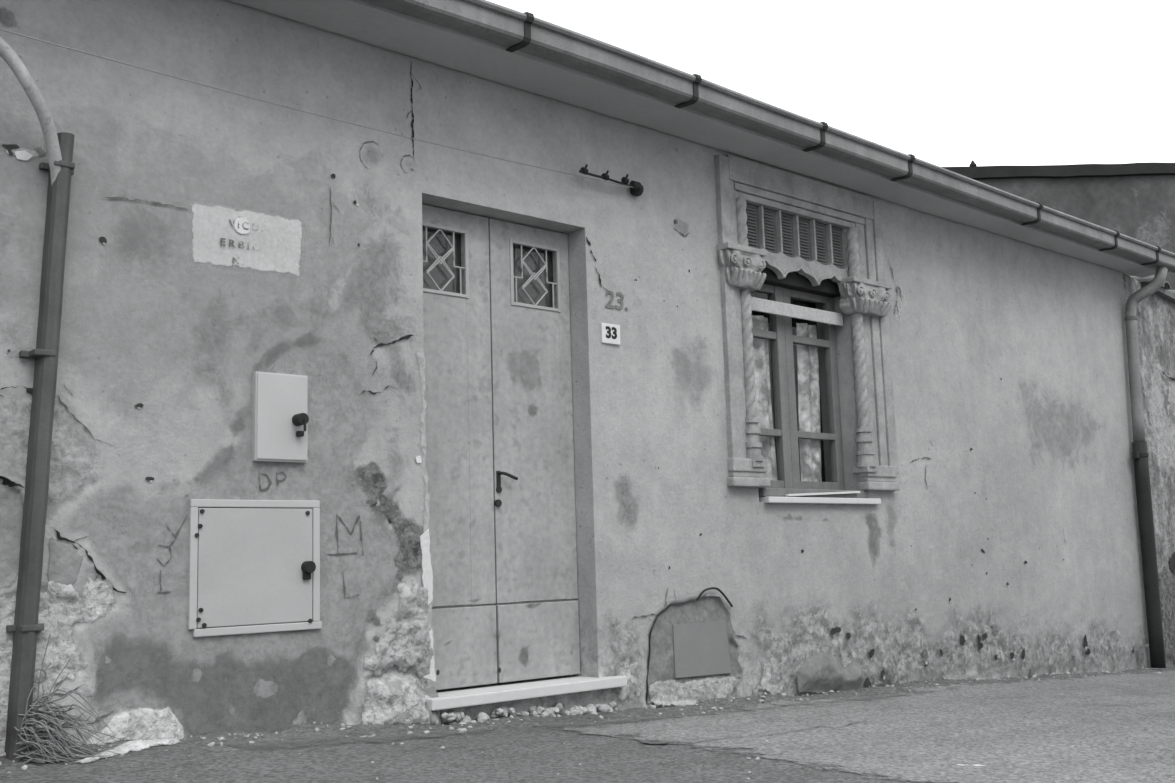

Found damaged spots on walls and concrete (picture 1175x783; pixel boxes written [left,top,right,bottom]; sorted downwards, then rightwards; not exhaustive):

crack [406,61,422,156]
crack [359,334,414,396]
crack [0,476,24,488]
flaking render [0,388,33,477]
flaking render [47,405,98,515]
crack [58,384,114,447]
crack [54,529,127,593]
flaking render [351,353,436,682]
flaking render [0,595,16,754]
flaking render [32,577,116,709]
spalling [753,598,1149,695]
flaking render [86,707,184,744]